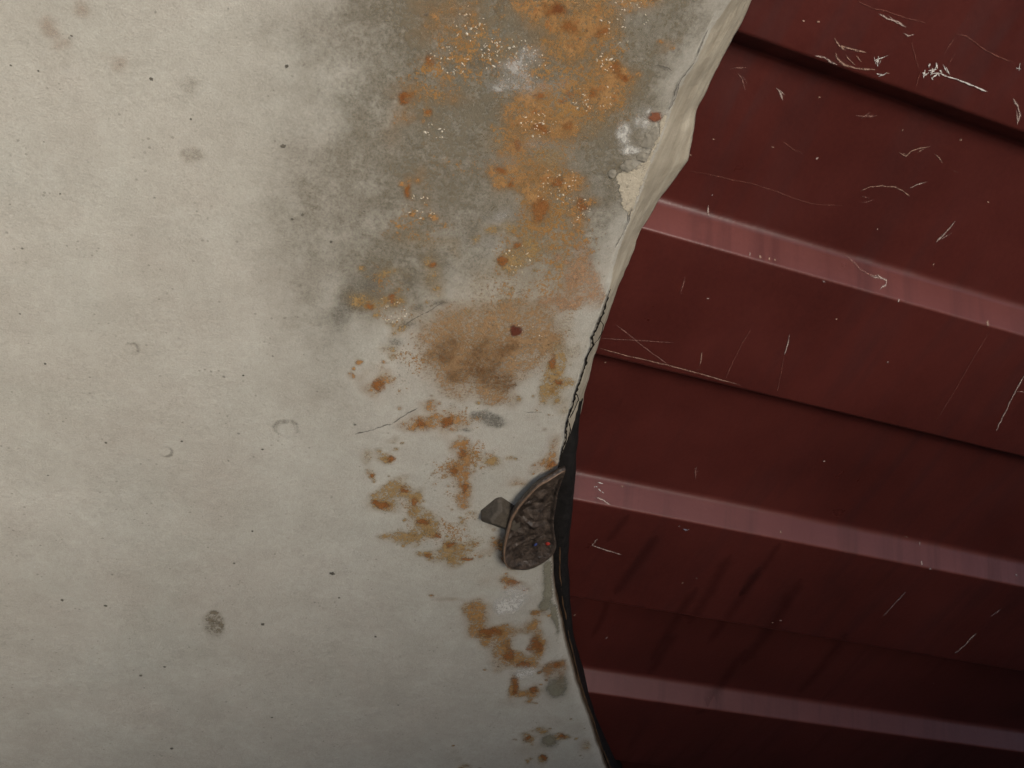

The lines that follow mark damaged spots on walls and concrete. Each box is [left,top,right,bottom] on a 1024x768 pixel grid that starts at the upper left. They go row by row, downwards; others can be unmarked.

rust [349,0,662,591]
damp [327,0,703,321]
crack [558,289,611,467]
rust [461,547,611,768]